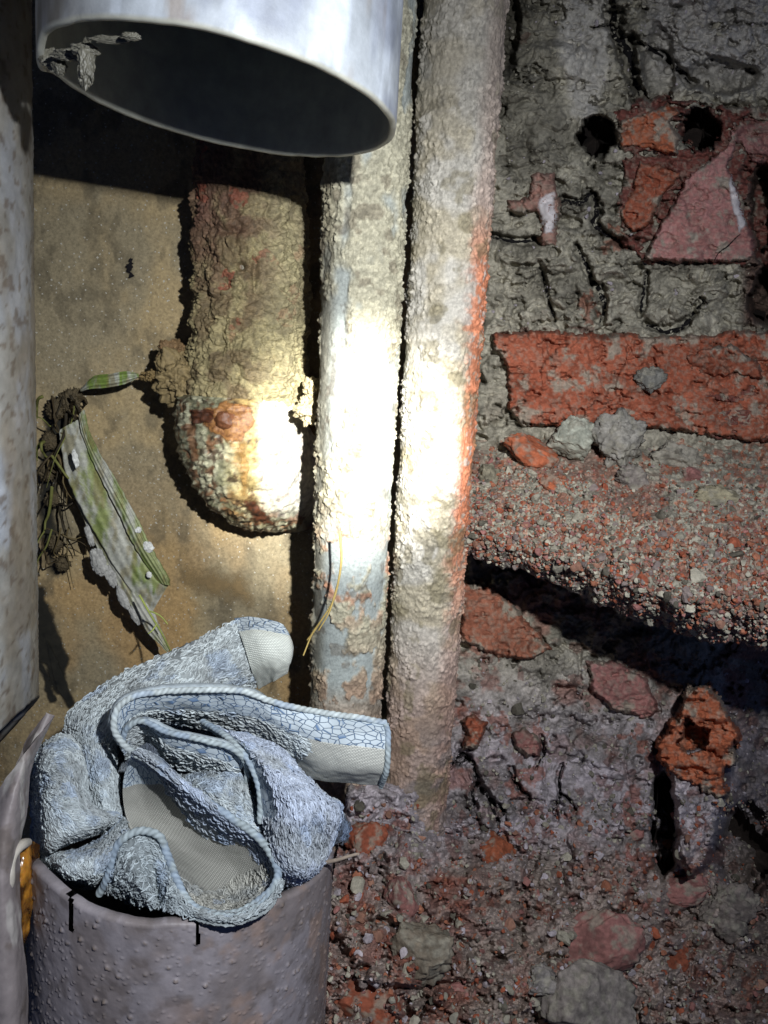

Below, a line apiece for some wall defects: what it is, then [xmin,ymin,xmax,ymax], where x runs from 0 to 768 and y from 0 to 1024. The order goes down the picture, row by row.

crack [592,0,691,96]
spalling [614,92,768,269]
crack [491,235,536,243]
crack [561,192,620,243]
crack [541,272,555,318]
crack [577,250,606,323]
crack [639,275,704,334]
corrosion [190,401,275,525]
spalling [585,660,742,805]